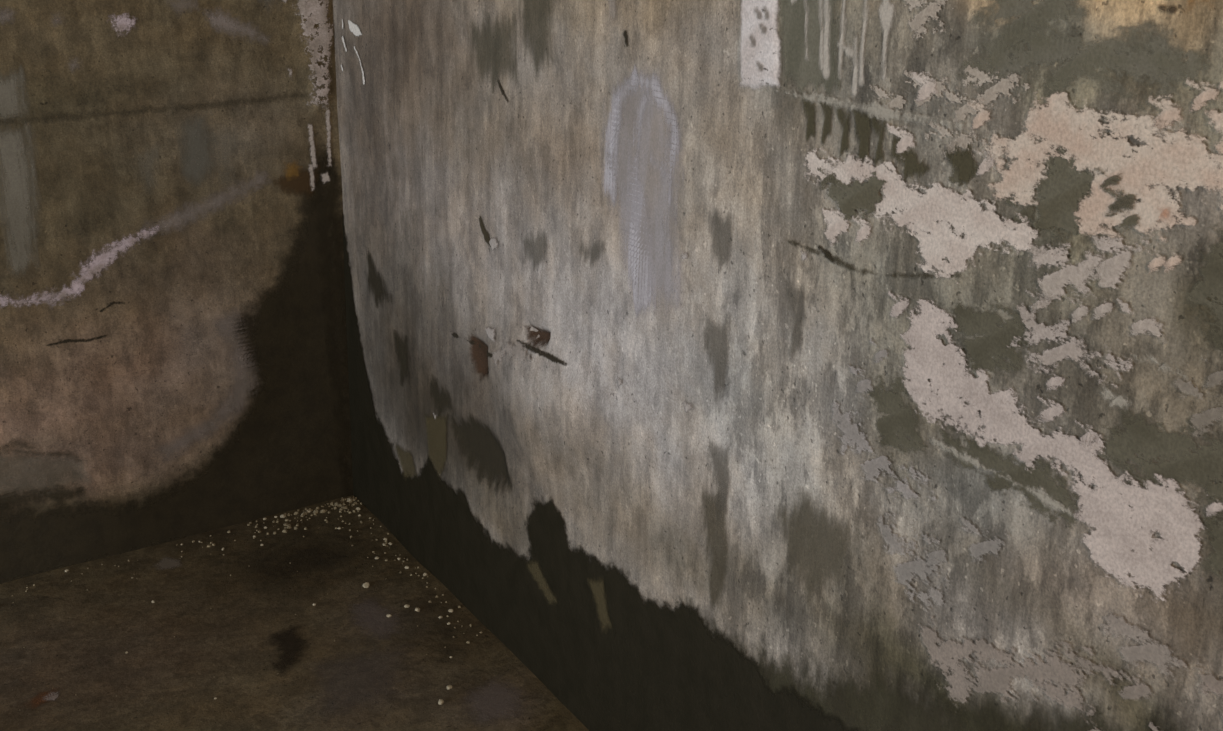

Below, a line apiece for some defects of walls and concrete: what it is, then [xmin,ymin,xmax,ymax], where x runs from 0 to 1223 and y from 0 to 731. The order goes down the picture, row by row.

peeling [740,0,780,88]
peeling [904,0,954,39]
crack [788,241,953,278]
water stain [0,145,1112,731]
peeling [804,65,1223,731]